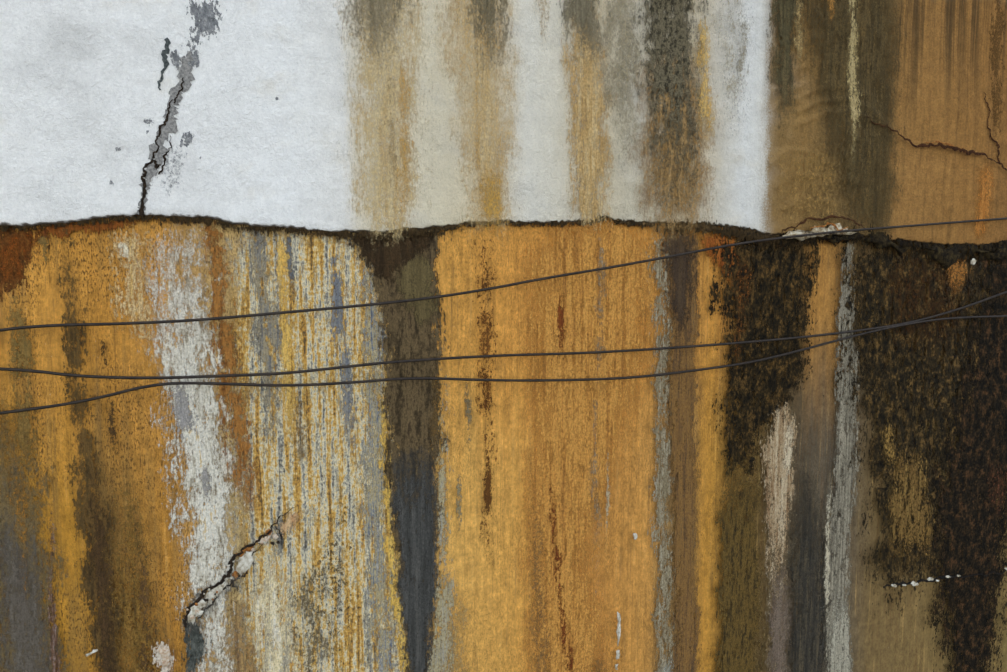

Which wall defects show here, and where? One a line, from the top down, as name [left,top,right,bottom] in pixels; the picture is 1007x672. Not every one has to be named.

rust [0,220,138,302]
damp [0,229,166,672]
crack [137,0,221,216]
crack [179,507,302,672]
damp [104,0,513,672]
rust [516,219,656,672]
damp [539,0,1007,672]
crack [867,94,1007,171]